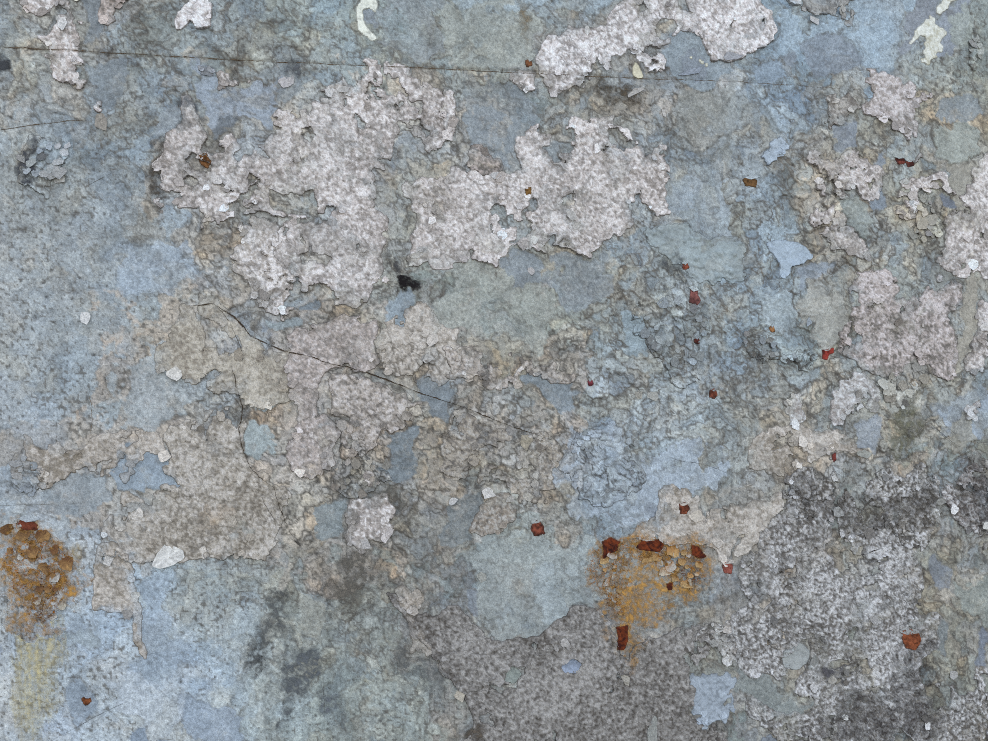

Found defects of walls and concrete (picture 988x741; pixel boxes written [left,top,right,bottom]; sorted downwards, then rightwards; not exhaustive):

peeling [16,134,71,199]
peeling [19,0,87,91]
peeling [401,115,671,270]
peeling [509,0,778,97]
peeling [786,0,855,27]
peeling [824,68,933,141]
peeling [151,58,576,555]
crack [192,302,549,545]
peeling [386,149,988,741]
corrosion [0,515,78,719]
peeling [9,406,292,659]
corrosion [585,531,734,651]